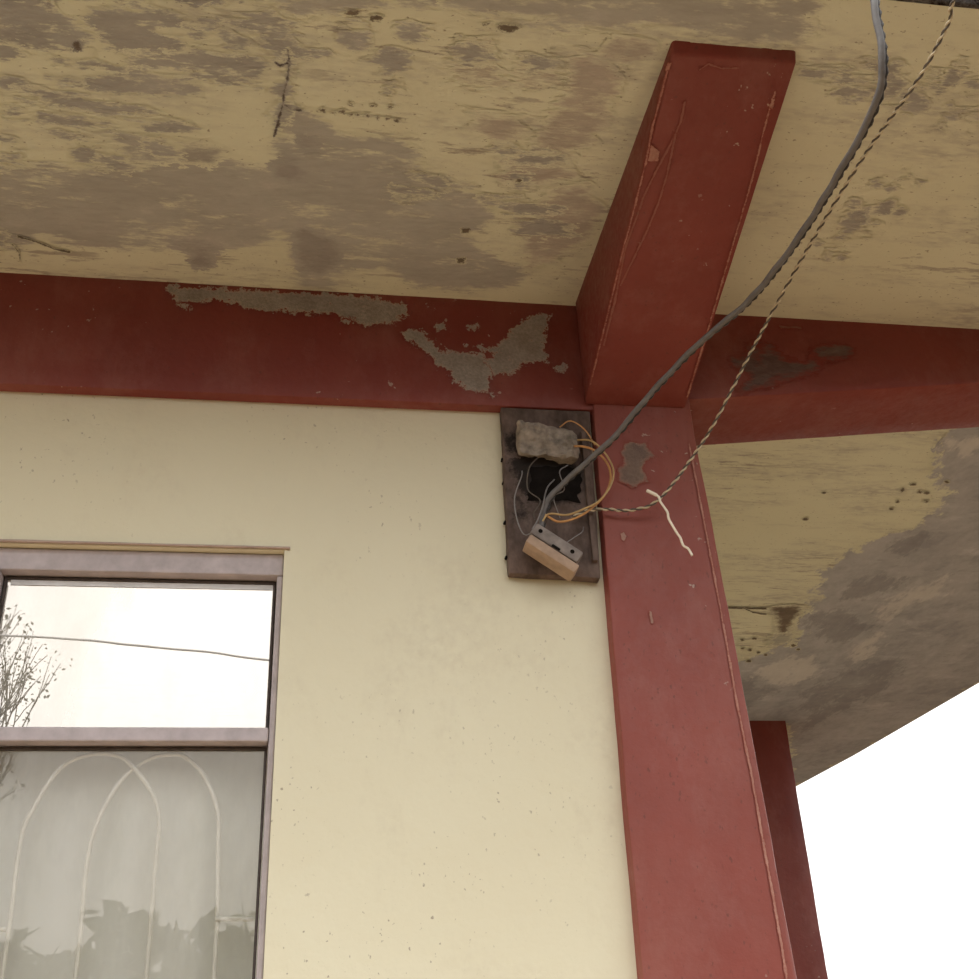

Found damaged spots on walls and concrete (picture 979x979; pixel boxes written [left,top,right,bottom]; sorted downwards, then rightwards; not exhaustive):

crack [273,49,302,137]
peeling [0,0,830,399]
peeling [617,427,657,489]
crack [728,607,767,615]
leakage [738,427,979,786]